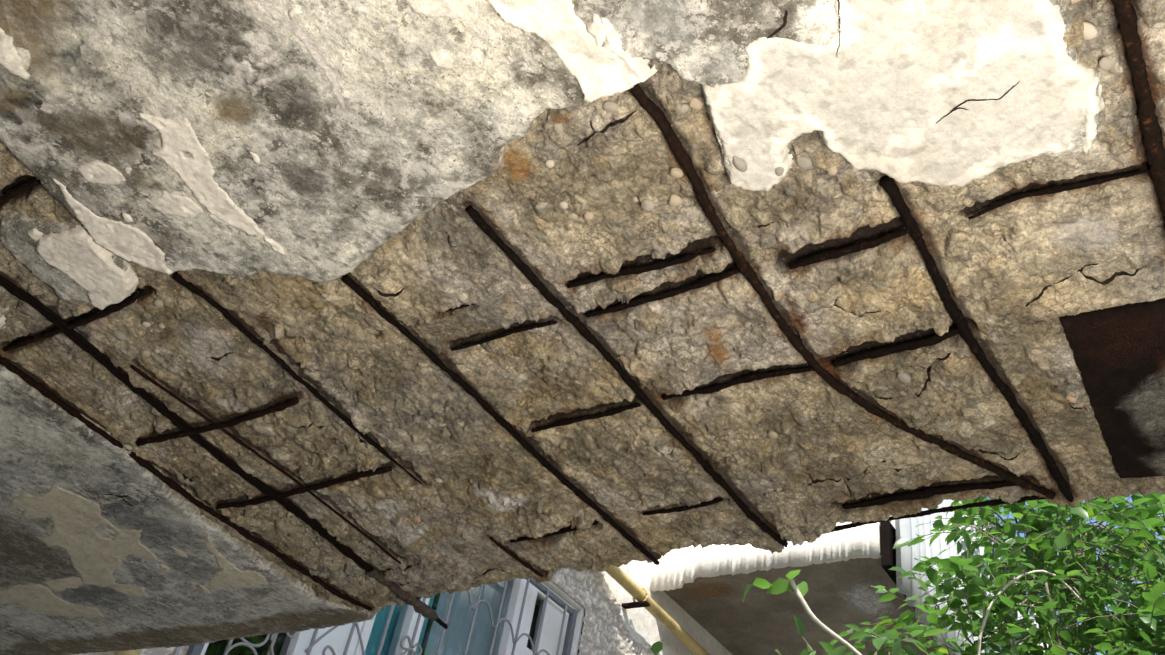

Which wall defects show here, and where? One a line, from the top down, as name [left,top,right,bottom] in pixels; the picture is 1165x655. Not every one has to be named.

spalling [0,272,422,617]
spalling [342,275,660,565]
peeling [487,0,658,102]
spalling [451,205,788,547]
crack [835,0,843,52]
spalling [628,83,1074,503]
peeling [701,0,1105,192]
spalling [843,481,1018,509]
crack [936,81,1020,124]
spalling [968,169,1147,220]
crack [1025,263,1147,307]
spalling [1112,0,1165,216]